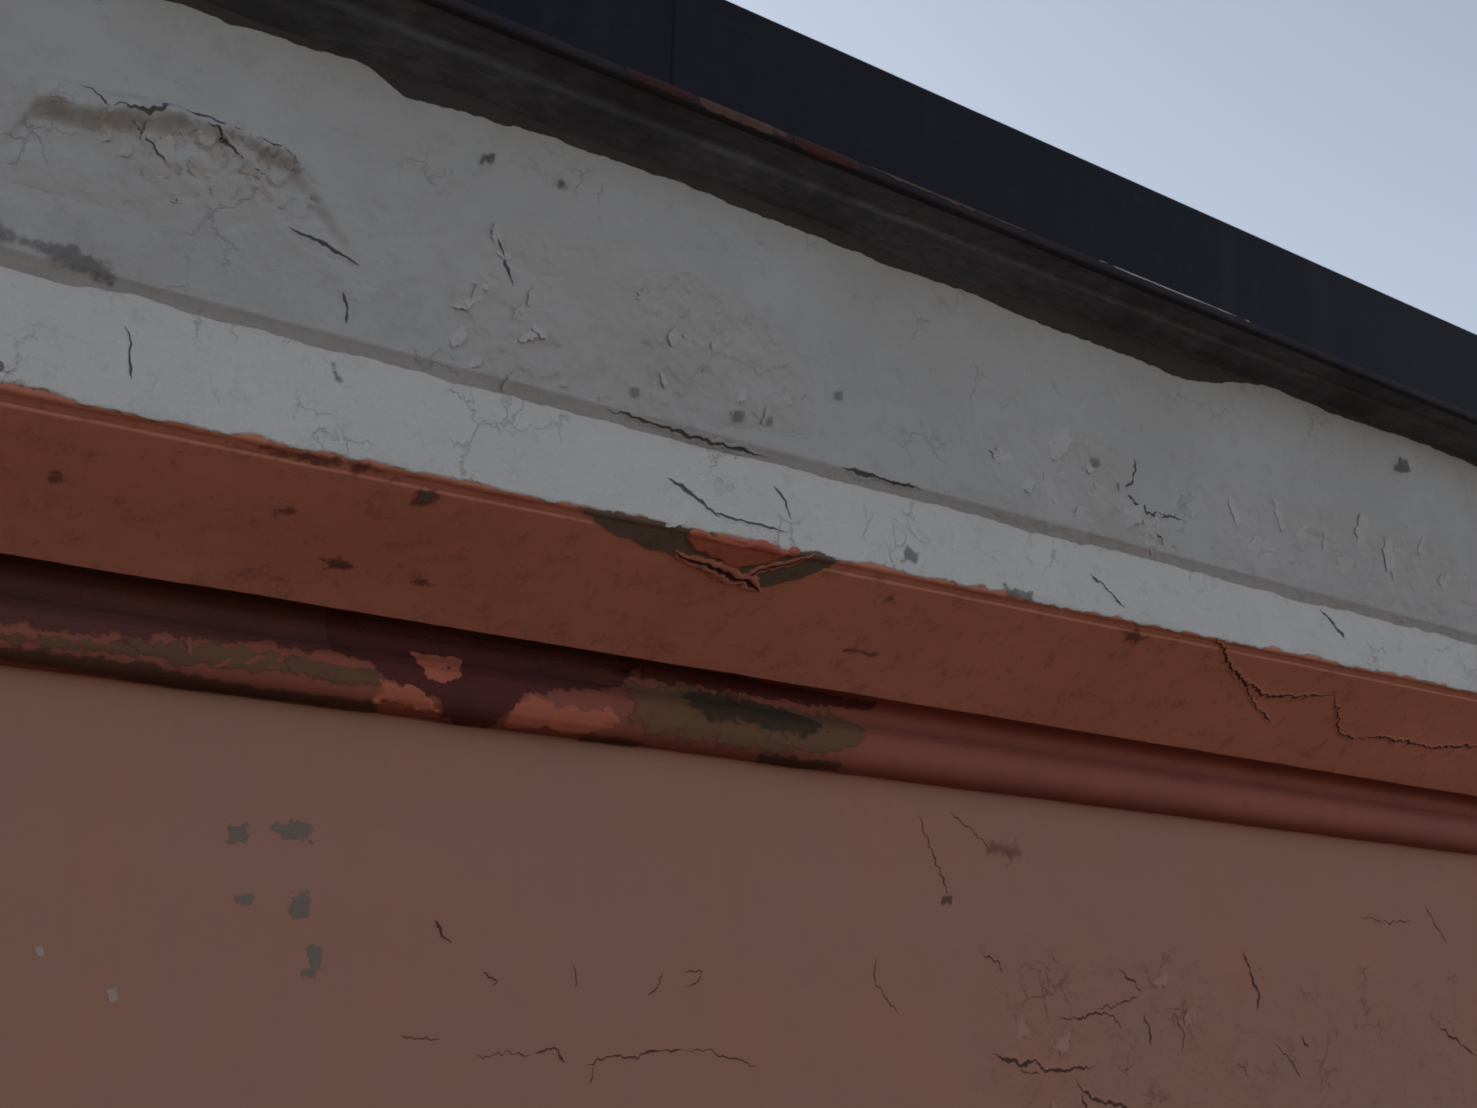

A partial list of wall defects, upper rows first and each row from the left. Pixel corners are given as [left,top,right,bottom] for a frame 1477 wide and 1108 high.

crack [609,409,791,533]
spalling [578,507,838,592]
peeling [0,554,877,755]
crack [1214,638,1477,752]
crack [919,812,990,894]
crack [400,1034,439,1042]
crack [433,919,452,943]
crack [483,972,498,987]
crack [477,1046,760,1083]
crack [982,954,1003,974]
crack [994,1053,1158,1108]
crack [1060,969,1186,1054]